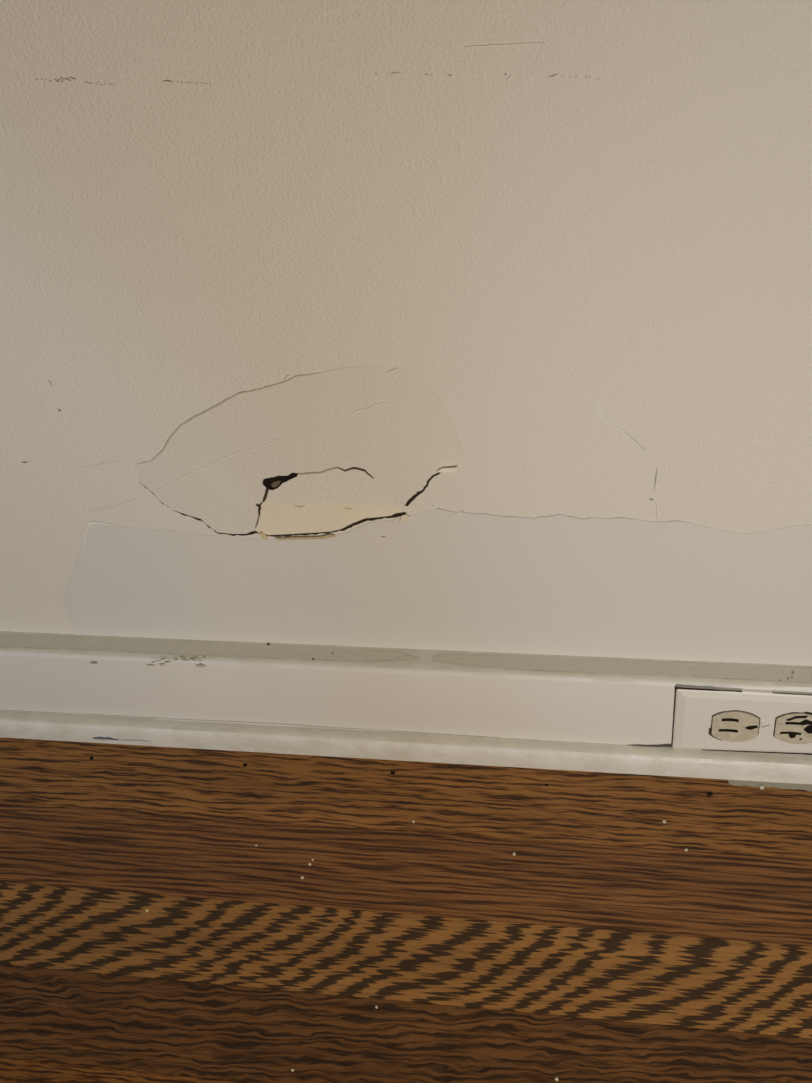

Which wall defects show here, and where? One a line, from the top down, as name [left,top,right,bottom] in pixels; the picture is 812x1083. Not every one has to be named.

crack [139,373,440,537]
peeling [255,473,410,540]
peeling [786,715,812,725]